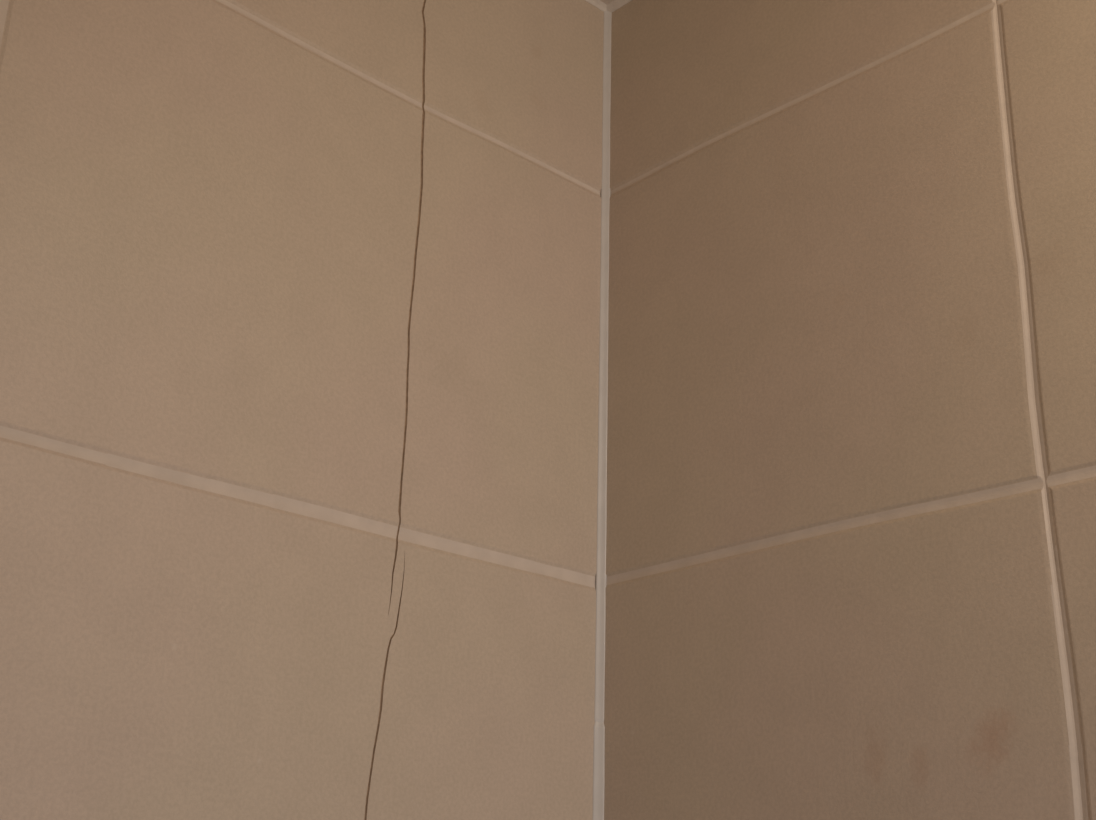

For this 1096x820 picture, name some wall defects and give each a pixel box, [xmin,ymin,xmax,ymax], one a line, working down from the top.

crack [364,0,426,820]